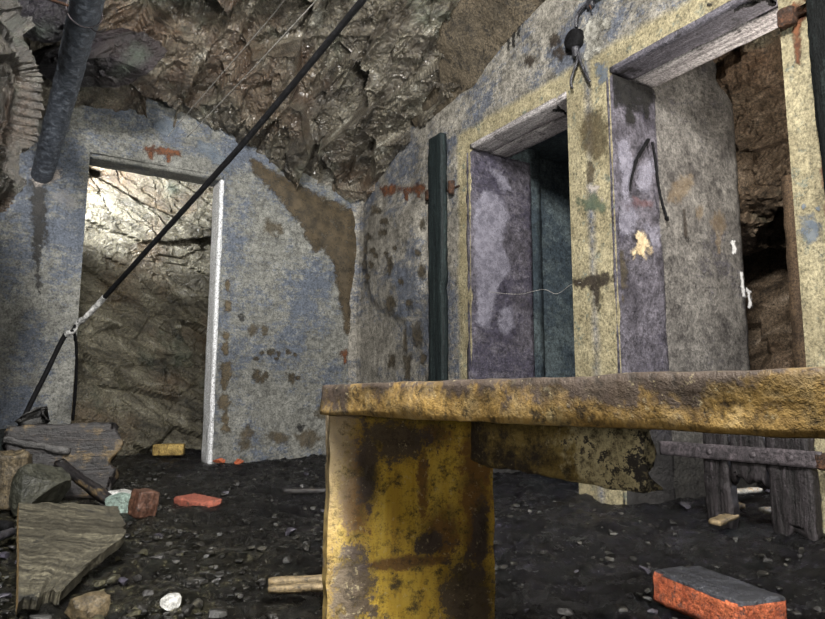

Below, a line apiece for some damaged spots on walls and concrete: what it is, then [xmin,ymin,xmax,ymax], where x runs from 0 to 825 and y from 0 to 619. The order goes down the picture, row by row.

corrosion [792,0,806,65]
corrosion [143,145,181,163]
peeling [265,218,283,237]
leakage [572,272,615,311]
leakage [239,424,254,449]
leakage [268,423,320,447]